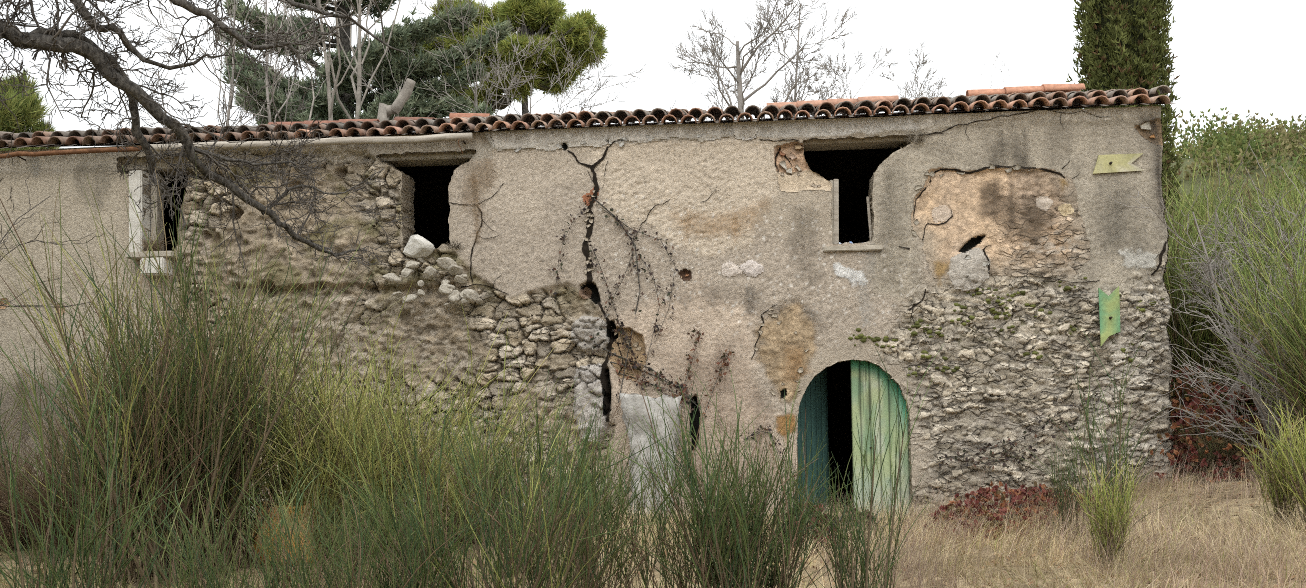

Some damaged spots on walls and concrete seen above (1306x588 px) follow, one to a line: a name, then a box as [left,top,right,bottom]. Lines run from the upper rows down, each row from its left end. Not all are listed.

crack [567,138,628,422]
flaking render [774,142,832,192]
flaking render [911,163,1090,281]
flaking render [757,303,815,403]